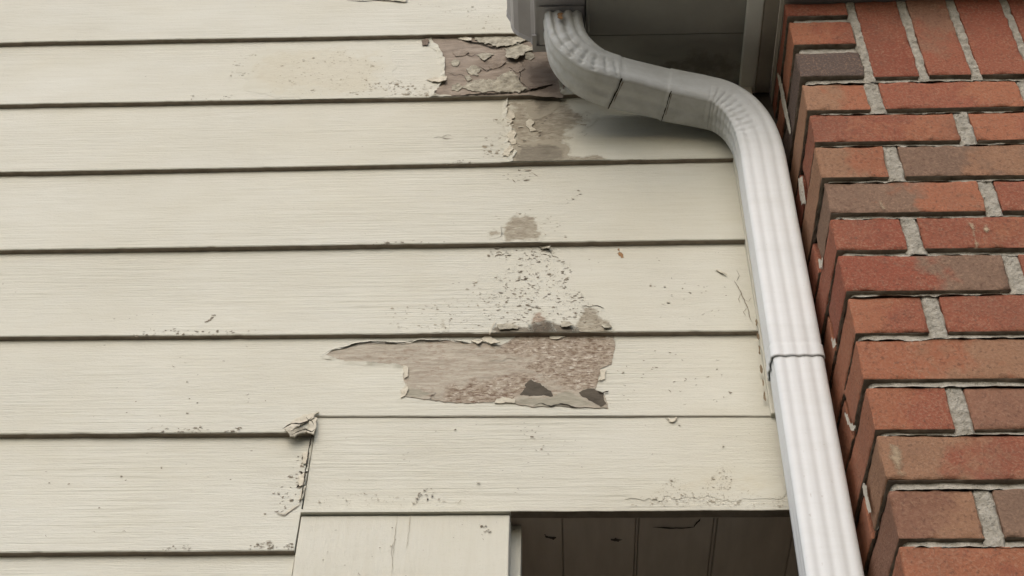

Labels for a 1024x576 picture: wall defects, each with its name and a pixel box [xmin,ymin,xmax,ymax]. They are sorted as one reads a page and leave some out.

peeling [291,6,610,182]
peeling [320,209,635,413]
peeling [285,411,319,438]